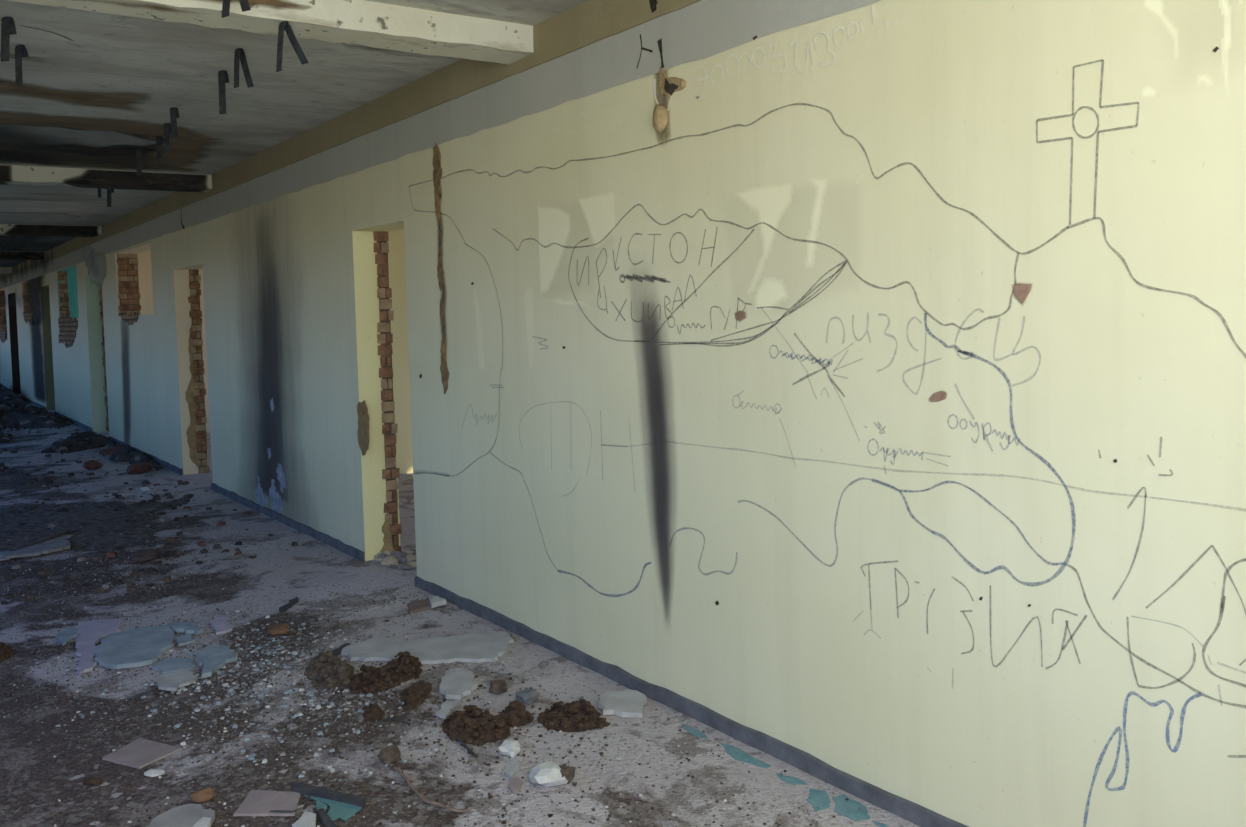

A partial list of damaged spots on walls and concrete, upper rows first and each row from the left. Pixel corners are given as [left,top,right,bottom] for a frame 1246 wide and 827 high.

peeling [0,125,156,147]
flaking render [58,271,78,348]
flaking render [83,247,141,431]
flaking render [185,270,210,473]
water stain [259,293,280,496]
flaking render [357,231,402,552]
water stain [645,325,667,583]